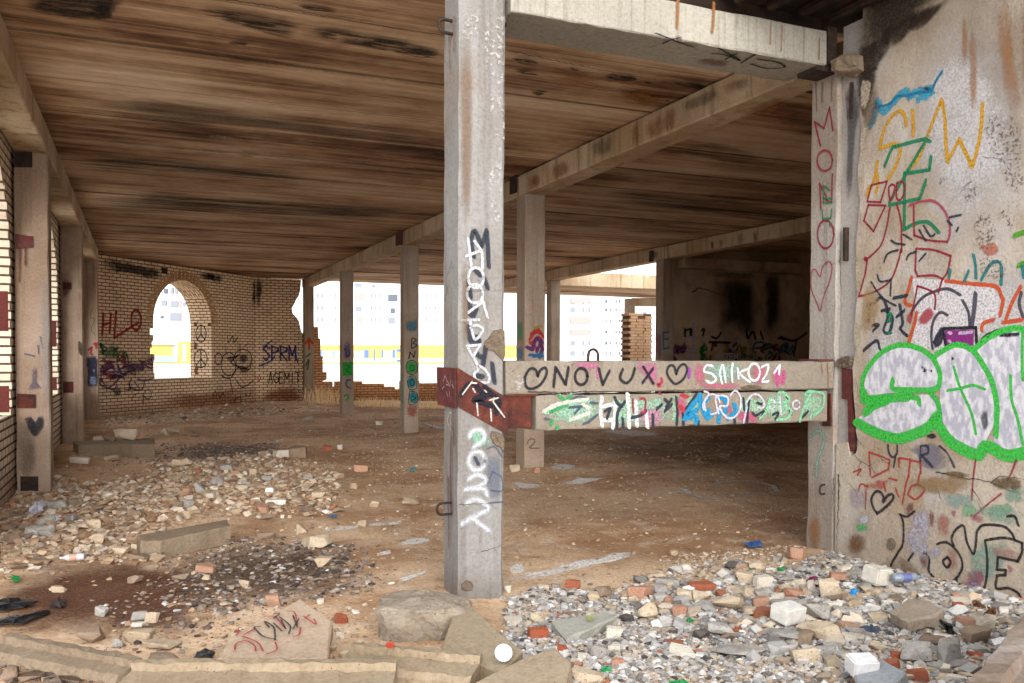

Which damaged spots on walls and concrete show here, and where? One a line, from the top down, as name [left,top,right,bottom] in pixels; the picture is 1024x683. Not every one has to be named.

damp [859,0,941,124]
crack [935,472,1024,513]